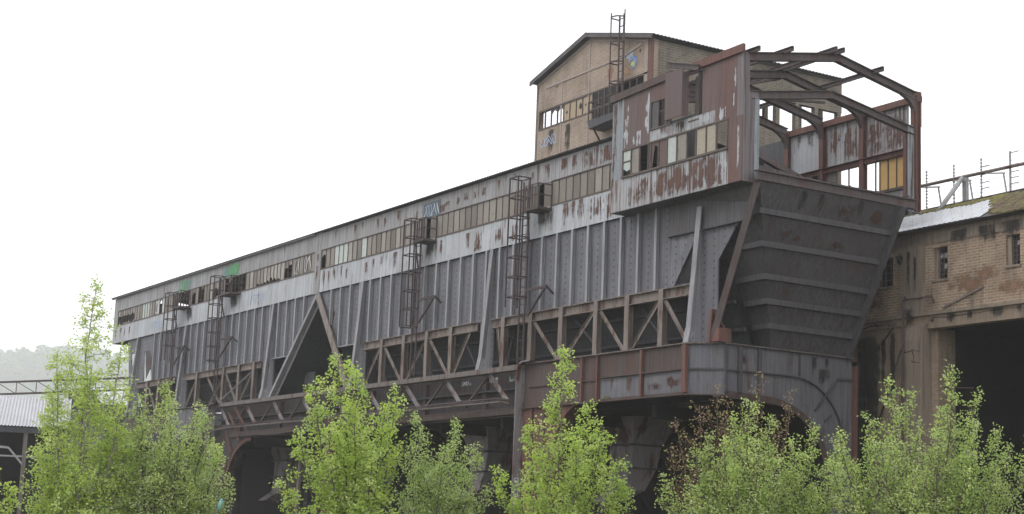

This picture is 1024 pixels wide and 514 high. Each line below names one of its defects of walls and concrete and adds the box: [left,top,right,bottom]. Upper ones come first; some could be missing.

corrosion [548,199,584,228]